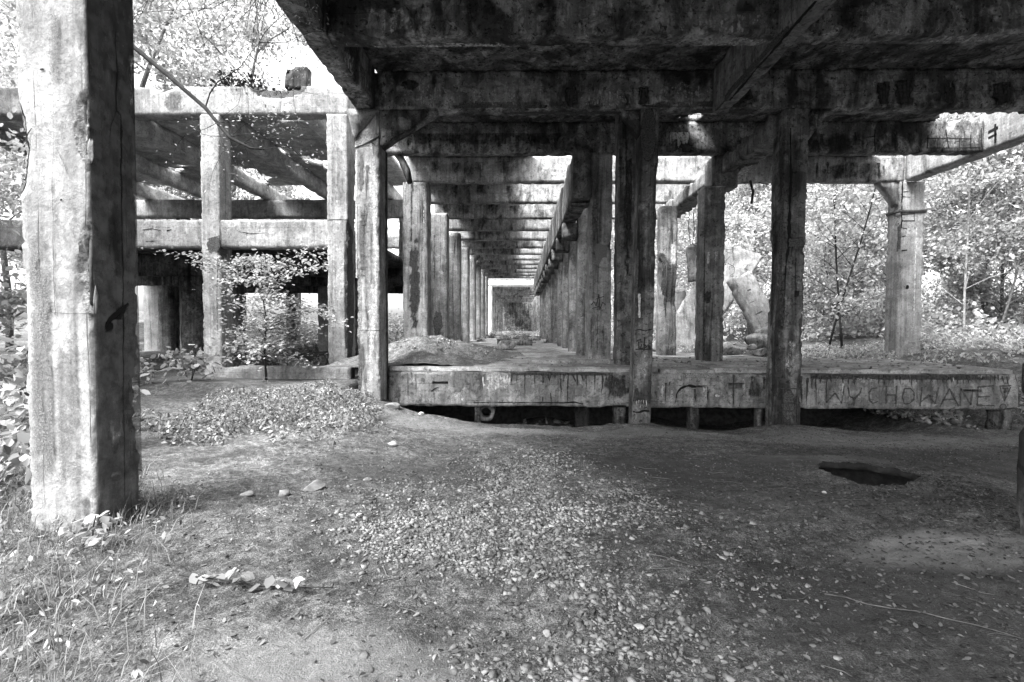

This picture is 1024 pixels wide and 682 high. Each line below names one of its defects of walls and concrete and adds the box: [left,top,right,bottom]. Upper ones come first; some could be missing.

damp [638,86,708,105]
damp [877,80,913,105]
damp [992,82,1011,105]
damp [404,182,441,329]
damp [355,139,435,402]
damp [433,311,443,335]